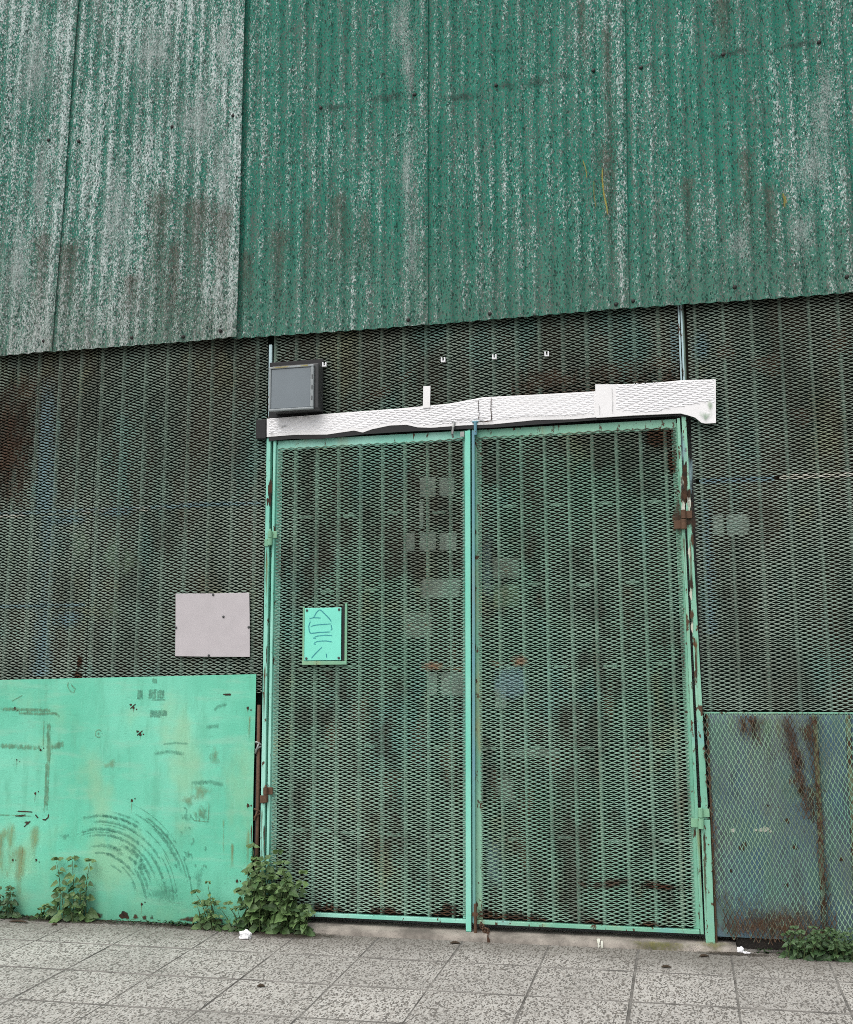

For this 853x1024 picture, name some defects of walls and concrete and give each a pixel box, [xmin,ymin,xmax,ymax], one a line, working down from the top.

rust [644,428,697,682]
rust [698,716,716,898]
rust [722,715,837,945]